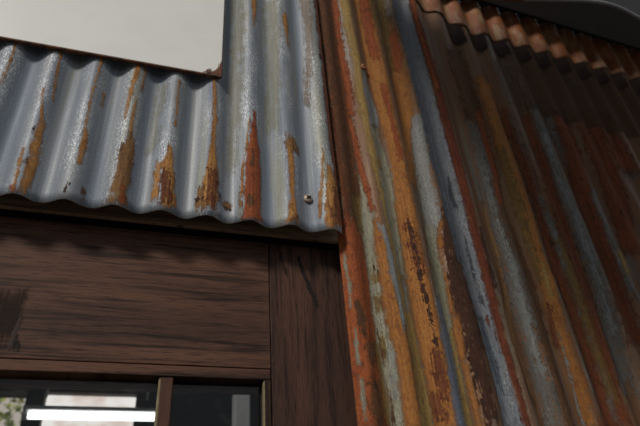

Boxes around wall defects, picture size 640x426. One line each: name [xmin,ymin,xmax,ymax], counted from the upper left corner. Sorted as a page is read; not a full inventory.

corrosion [8,103,46,195]
corrosion [76,58,104,165]
corrosion [106,65,147,206]
corrosion [151,143,176,208]
corrosion [194,61,222,211]
corrosion [239,110,263,221]
corrosion [284,132,300,224]
corrosion [313,0,421,426]
corrosion [354,0,457,426]
corrosion [408,0,640,426]